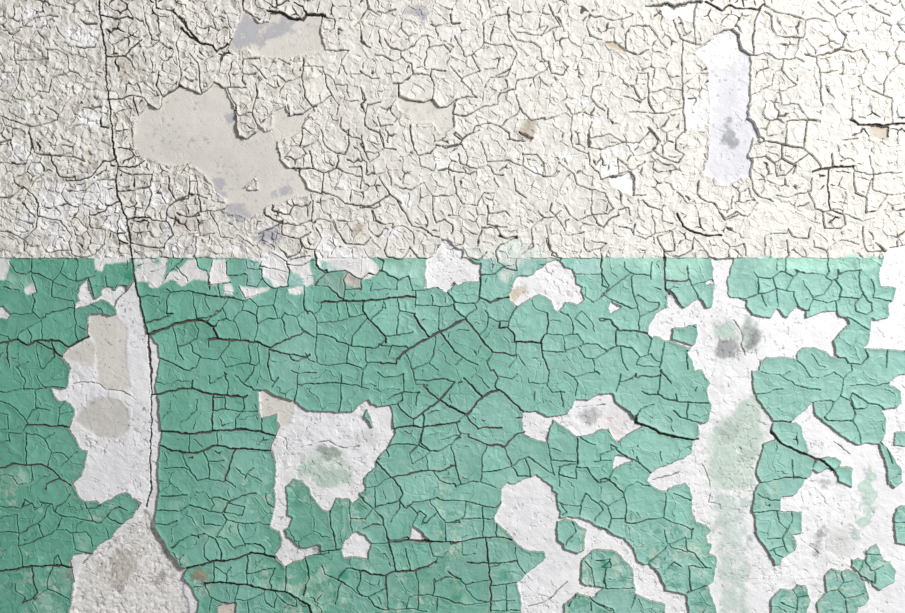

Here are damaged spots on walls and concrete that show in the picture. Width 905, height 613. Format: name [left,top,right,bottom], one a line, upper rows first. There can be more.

crack [704,0,766,22]
crack [849,111,905,140]
crack [0,0,359,510]
peeling [0,0,905,443]
crack [676,213,735,246]
crack [812,157,861,221]
crack [320,294,550,494]
peeling [0,257,905,613]
crack [627,411,721,509]
crack [763,427,850,483]
crack [179,543,322,613]
crack [358,530,518,612]